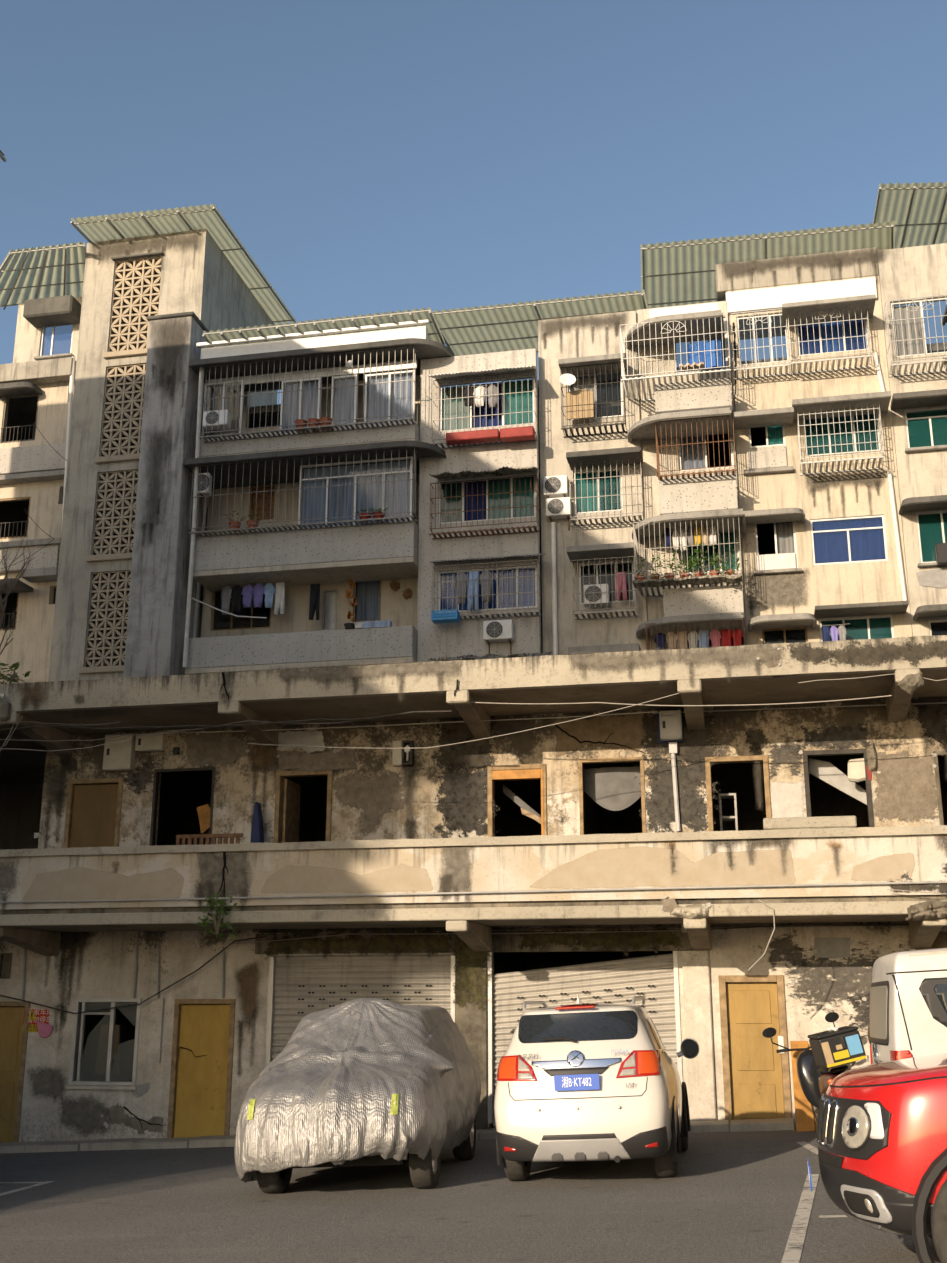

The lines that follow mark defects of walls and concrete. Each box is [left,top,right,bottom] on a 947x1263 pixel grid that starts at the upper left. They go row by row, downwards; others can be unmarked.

damp [153,320,187,398]
damp [143,433,168,540]
peeling [123,756,165,795]
damp [890,881,947,896]
damp [48,932,89,1021]
damp [236,964,259,1074]
damp [28,1068,110,1134]